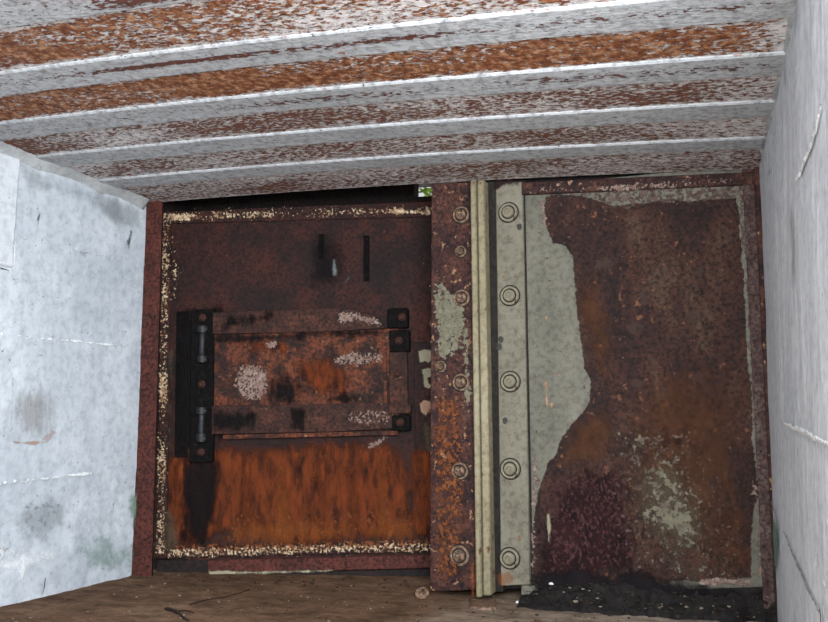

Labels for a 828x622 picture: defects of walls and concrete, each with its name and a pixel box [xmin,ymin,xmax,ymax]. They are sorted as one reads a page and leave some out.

rust [0,0,570,71]
rust [0,20,776,156]
rust [657,2,774,17]
rust [76,120,766,178]
rust [123,149,762,203]
peeling [419,276,473,419]
peeling [531,178,762,587]
rust [168,396,468,583]
rust [538,458,645,577]